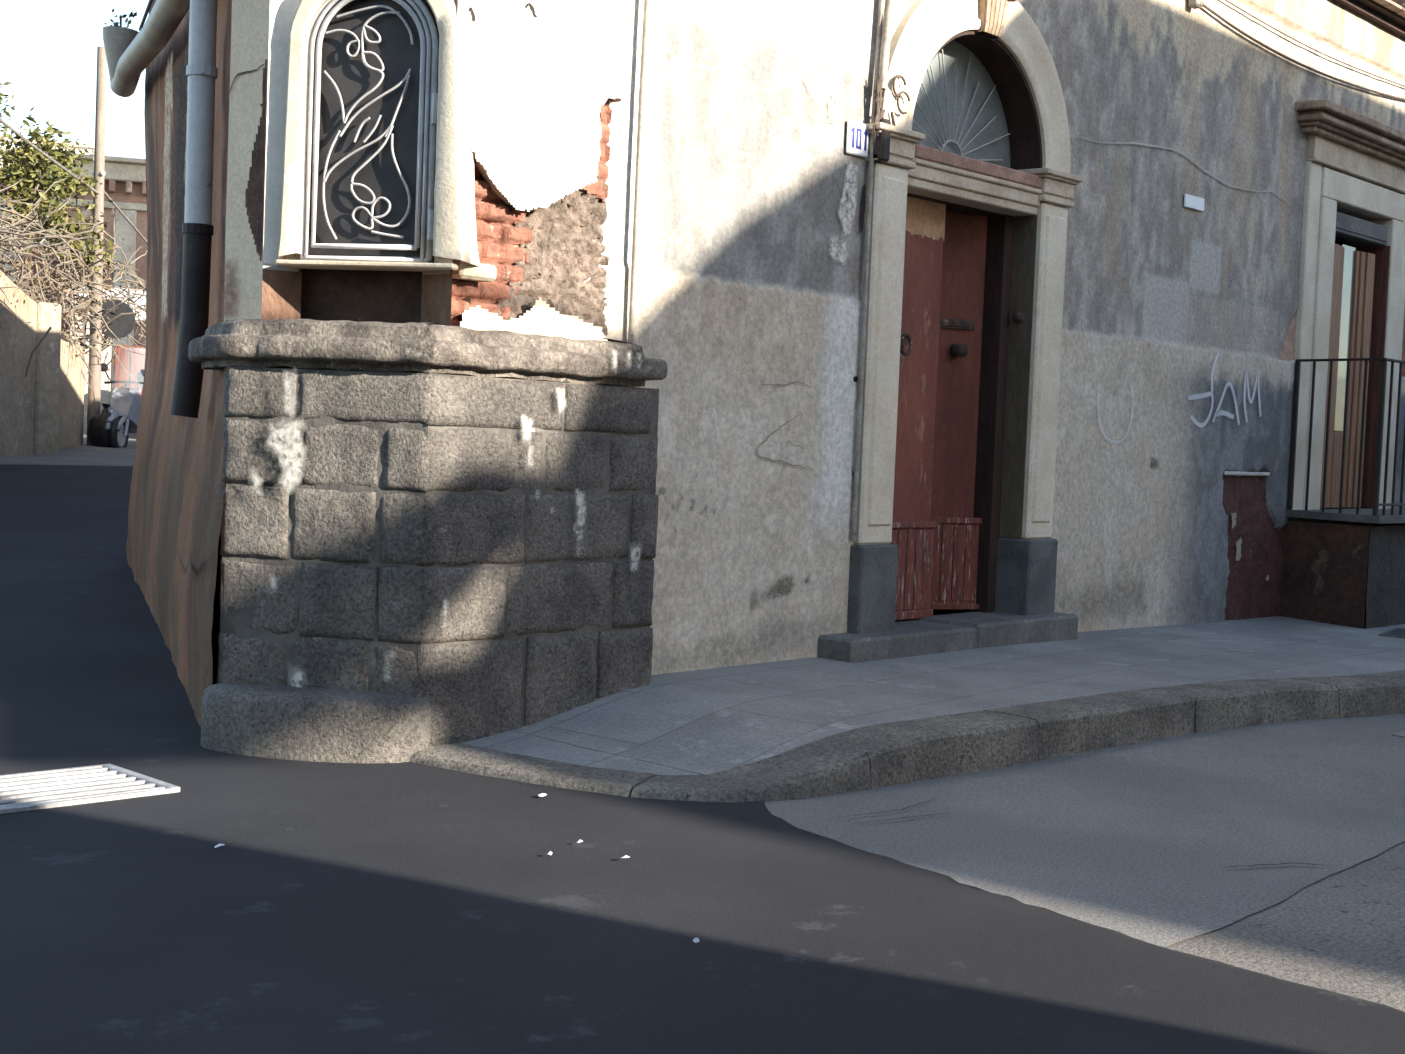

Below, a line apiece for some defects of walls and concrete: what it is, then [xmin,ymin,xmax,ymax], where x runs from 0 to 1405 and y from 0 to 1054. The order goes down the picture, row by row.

flaking render [442,95,620,341]
efflorescence [269,378,304,490]